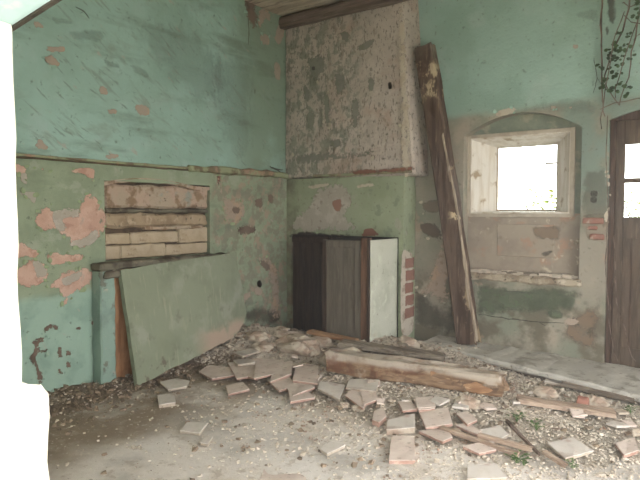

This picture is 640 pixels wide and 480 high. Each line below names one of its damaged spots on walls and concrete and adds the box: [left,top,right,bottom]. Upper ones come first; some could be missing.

peeling [16,164,107,307]
peeling [292,182,378,237]
flaking render [580,208,609,242]
flaking render [400,223,449,336]
flaking render [27,324,71,383]